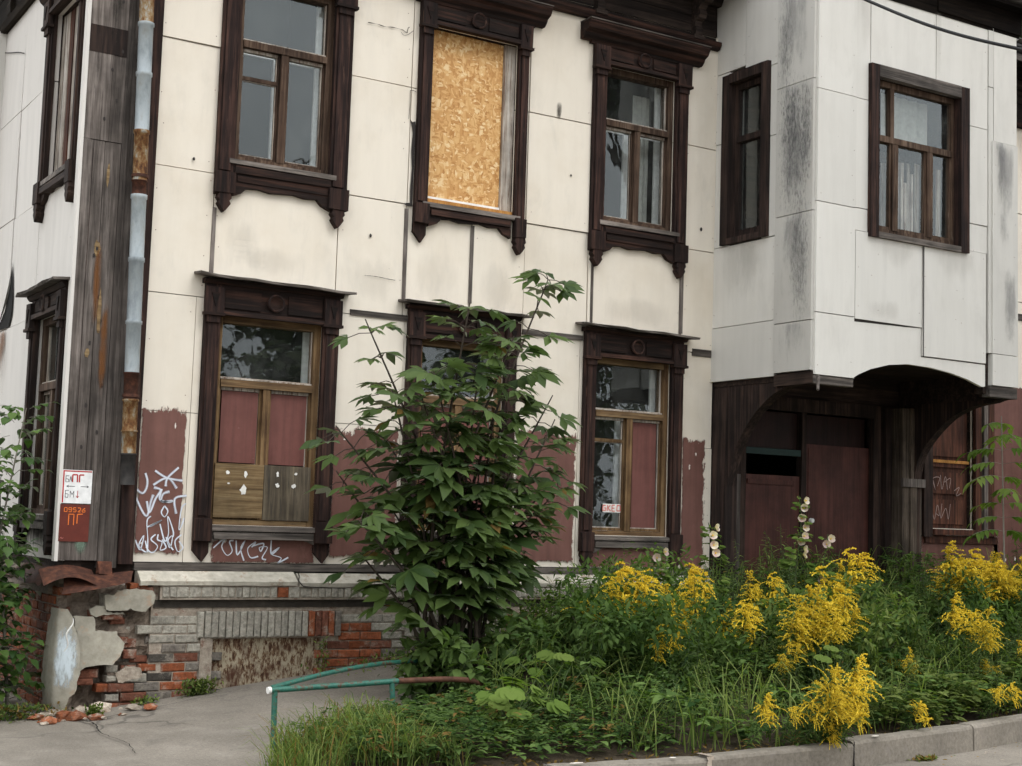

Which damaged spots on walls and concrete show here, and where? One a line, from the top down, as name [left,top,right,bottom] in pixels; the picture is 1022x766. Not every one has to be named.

rust [94,252,107,381]
spalling [57,582,156,711]